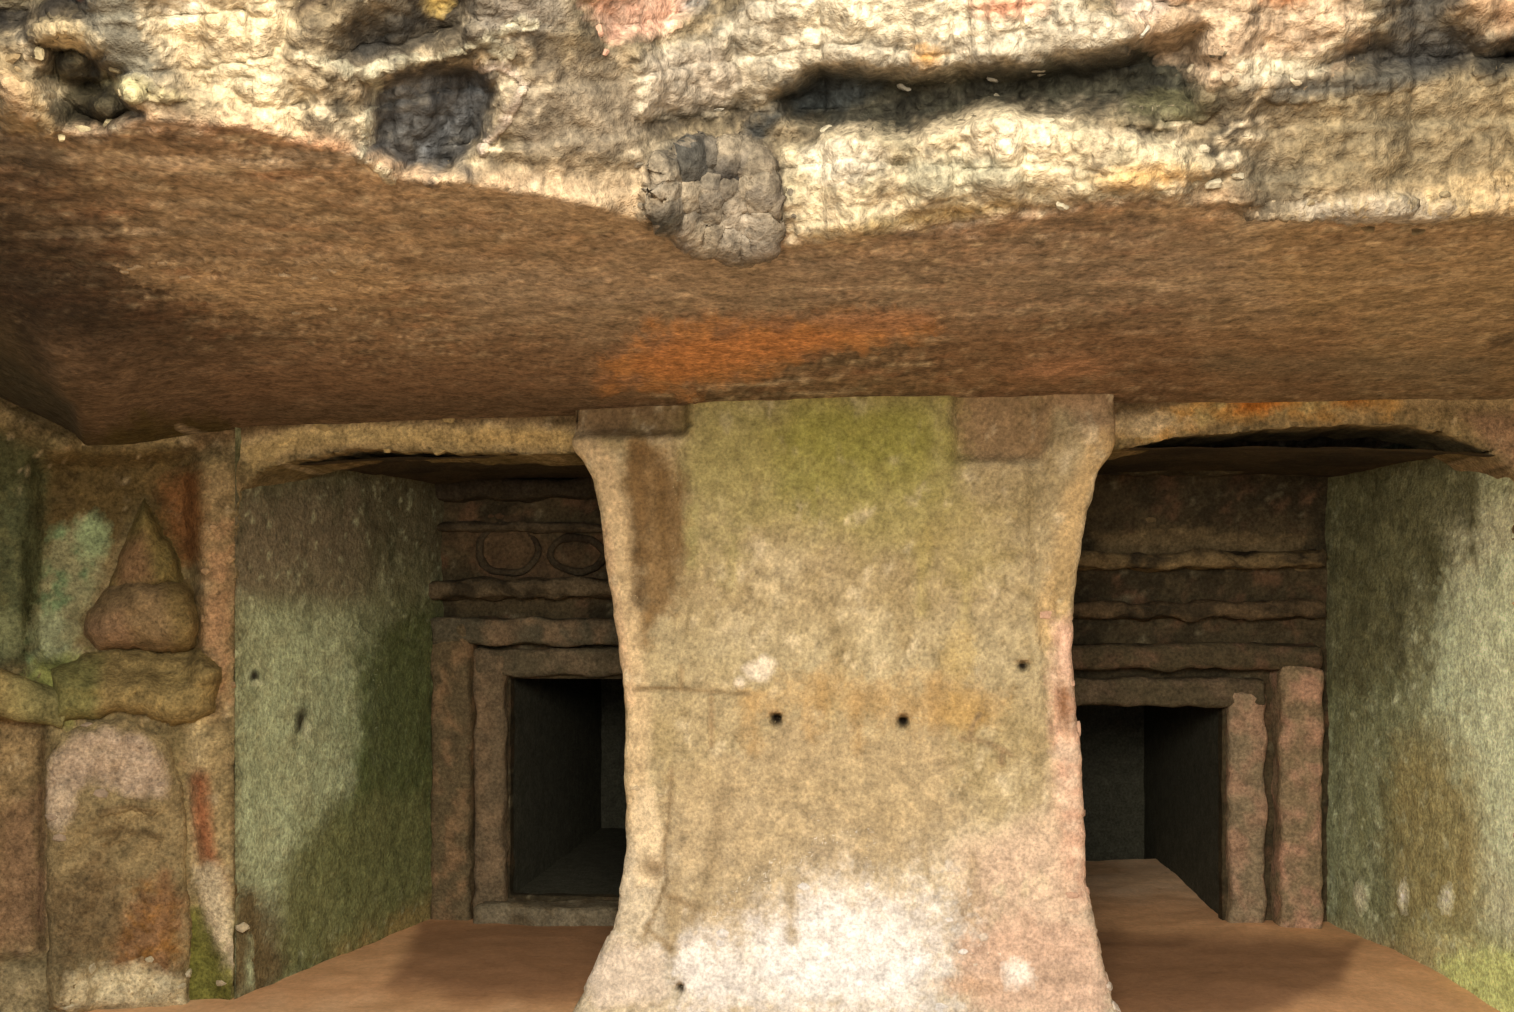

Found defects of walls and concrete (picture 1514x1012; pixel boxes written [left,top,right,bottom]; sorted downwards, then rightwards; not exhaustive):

damp [617,426,704,653]
damp [771,396,963,528]
damp [44,668,432,1012]